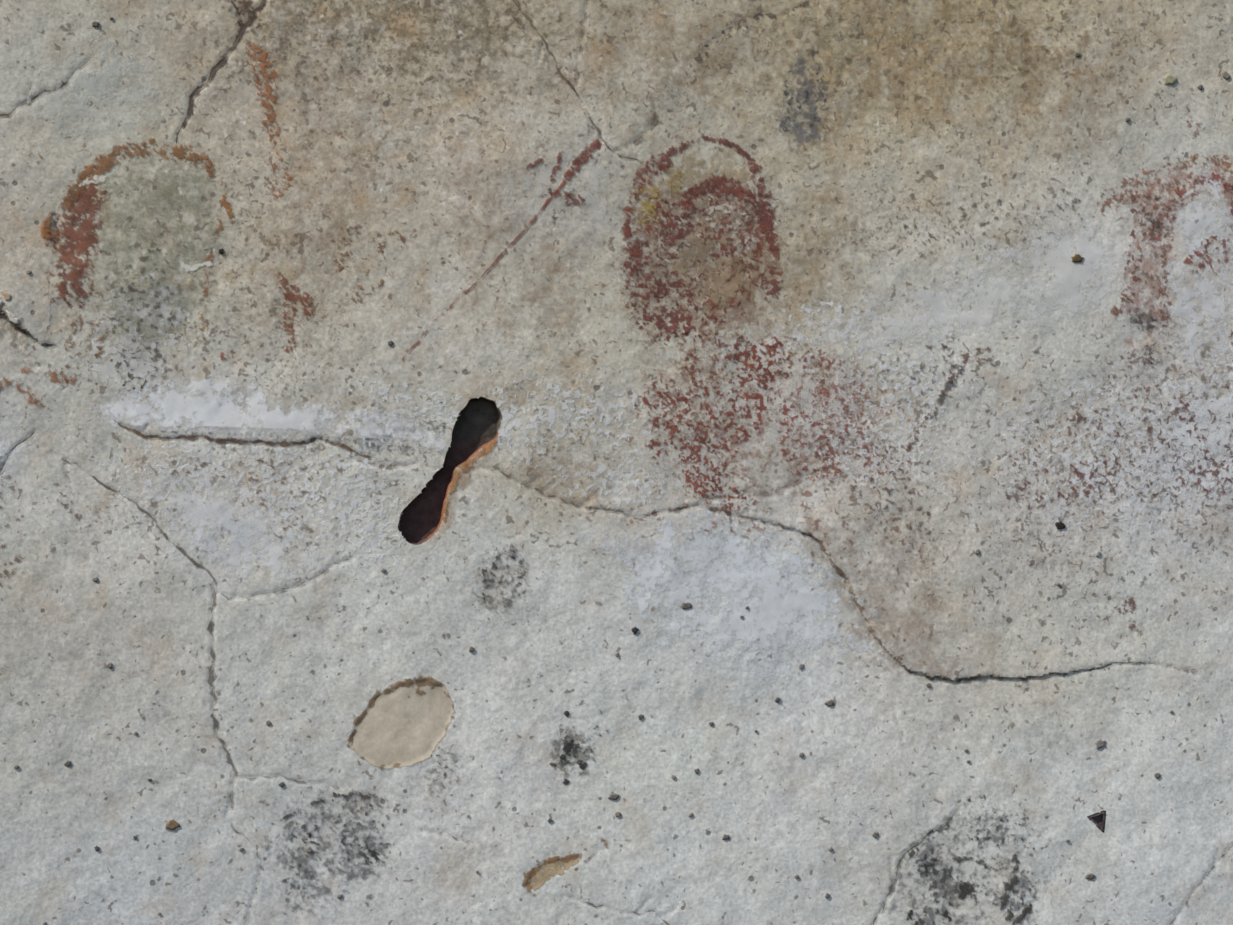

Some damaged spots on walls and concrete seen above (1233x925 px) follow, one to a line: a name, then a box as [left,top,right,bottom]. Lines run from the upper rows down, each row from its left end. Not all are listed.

crack [176,0,265,144]
leakage [780,50,827,156]
crack [0,309,56,347]
spalling [398,397,502,545]
leakage [477,546,527,609]
crack [536,469,884,649]
crack [62,459,349,914]
spalling [347,676,454,770]
crack [906,663,1188,682]
leakage [266,792,394,909]
spalling [522,854,591,895]
leakage [899,795,1036,925]